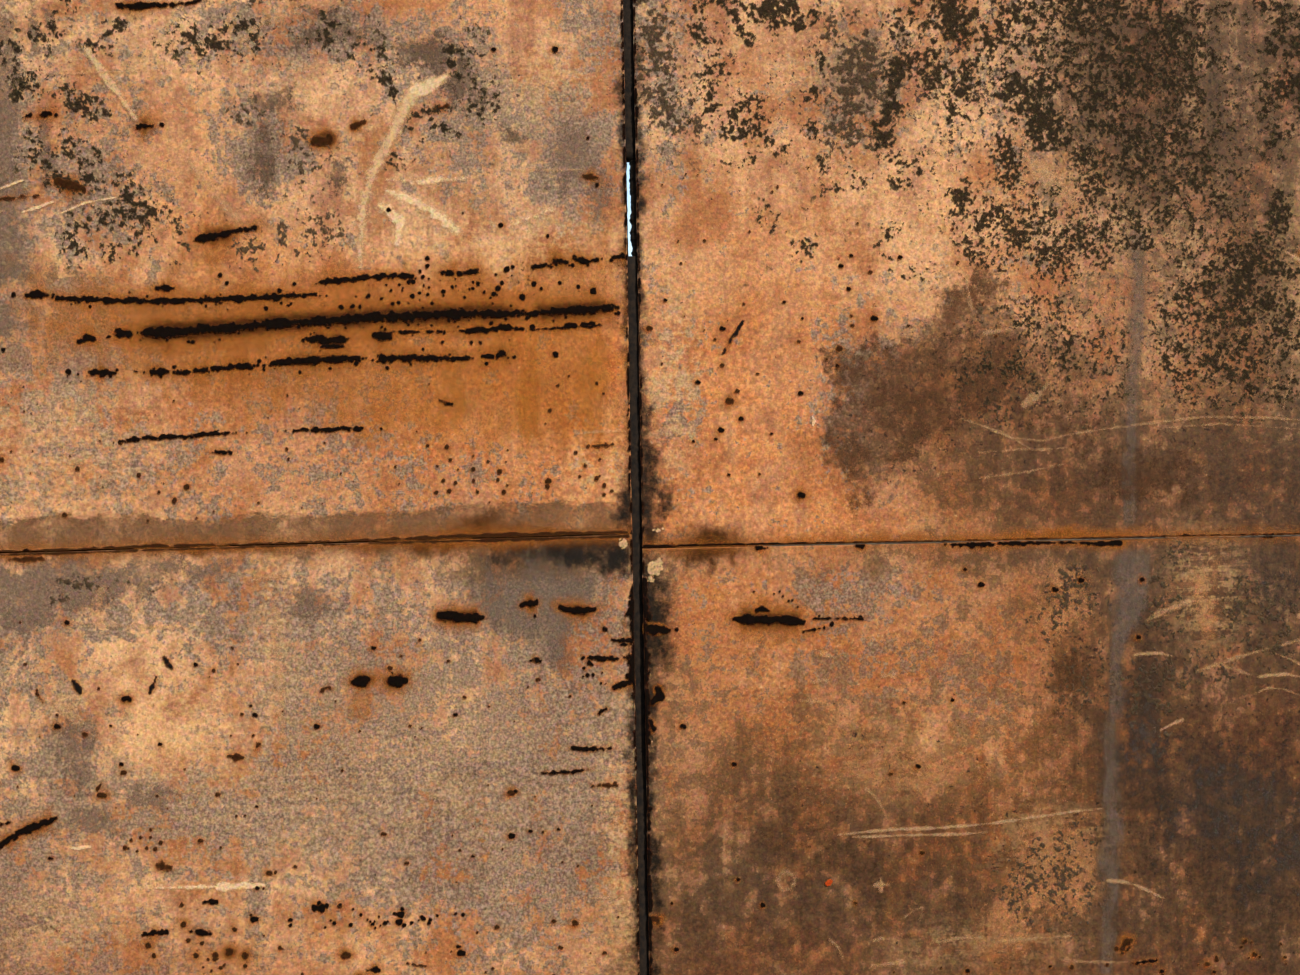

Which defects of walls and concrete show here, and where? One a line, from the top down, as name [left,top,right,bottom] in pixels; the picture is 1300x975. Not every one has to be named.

rust [11,0,653,537]
leakage [817,265,1216,516]
rust [0,353,633,574]
rust [434,606,481,627]
rust [348,655,410,691]
rust [581,584,637,776]
rust [119,695,133,704]
rust [0,814,52,846]
rust [155,860,173,872]
rust [141,929,169,937]
rust [339,949,353,961]